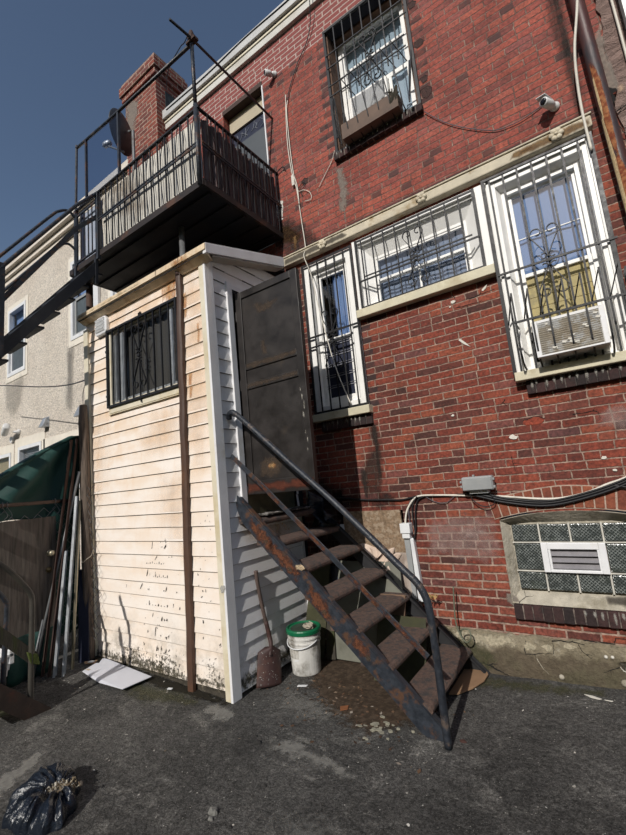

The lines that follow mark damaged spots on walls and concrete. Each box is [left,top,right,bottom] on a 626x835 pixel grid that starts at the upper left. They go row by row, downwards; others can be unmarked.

corrosion [164,283,187,317]
leakage [362,426,382,497]
corrosion [250,522,305,582]
leakage [97,644,225,692]
crack [524,638,626,673]